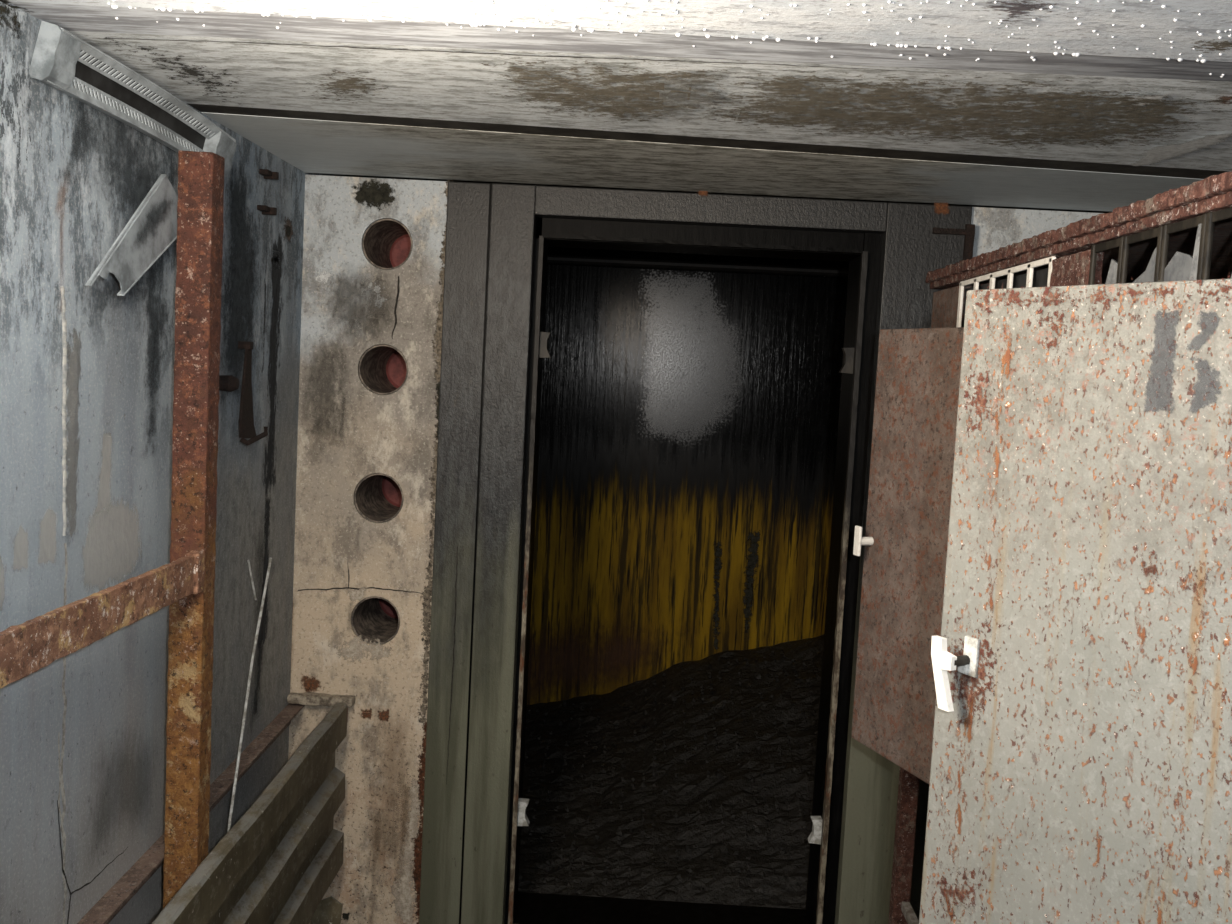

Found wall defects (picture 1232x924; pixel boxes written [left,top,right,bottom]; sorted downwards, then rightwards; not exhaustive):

damp [0,0,34,39]
damp [1191,39,1232,53]
damp [480,55,1232,166]
damp [352,178,395,210]
crack [57,657,128,924]